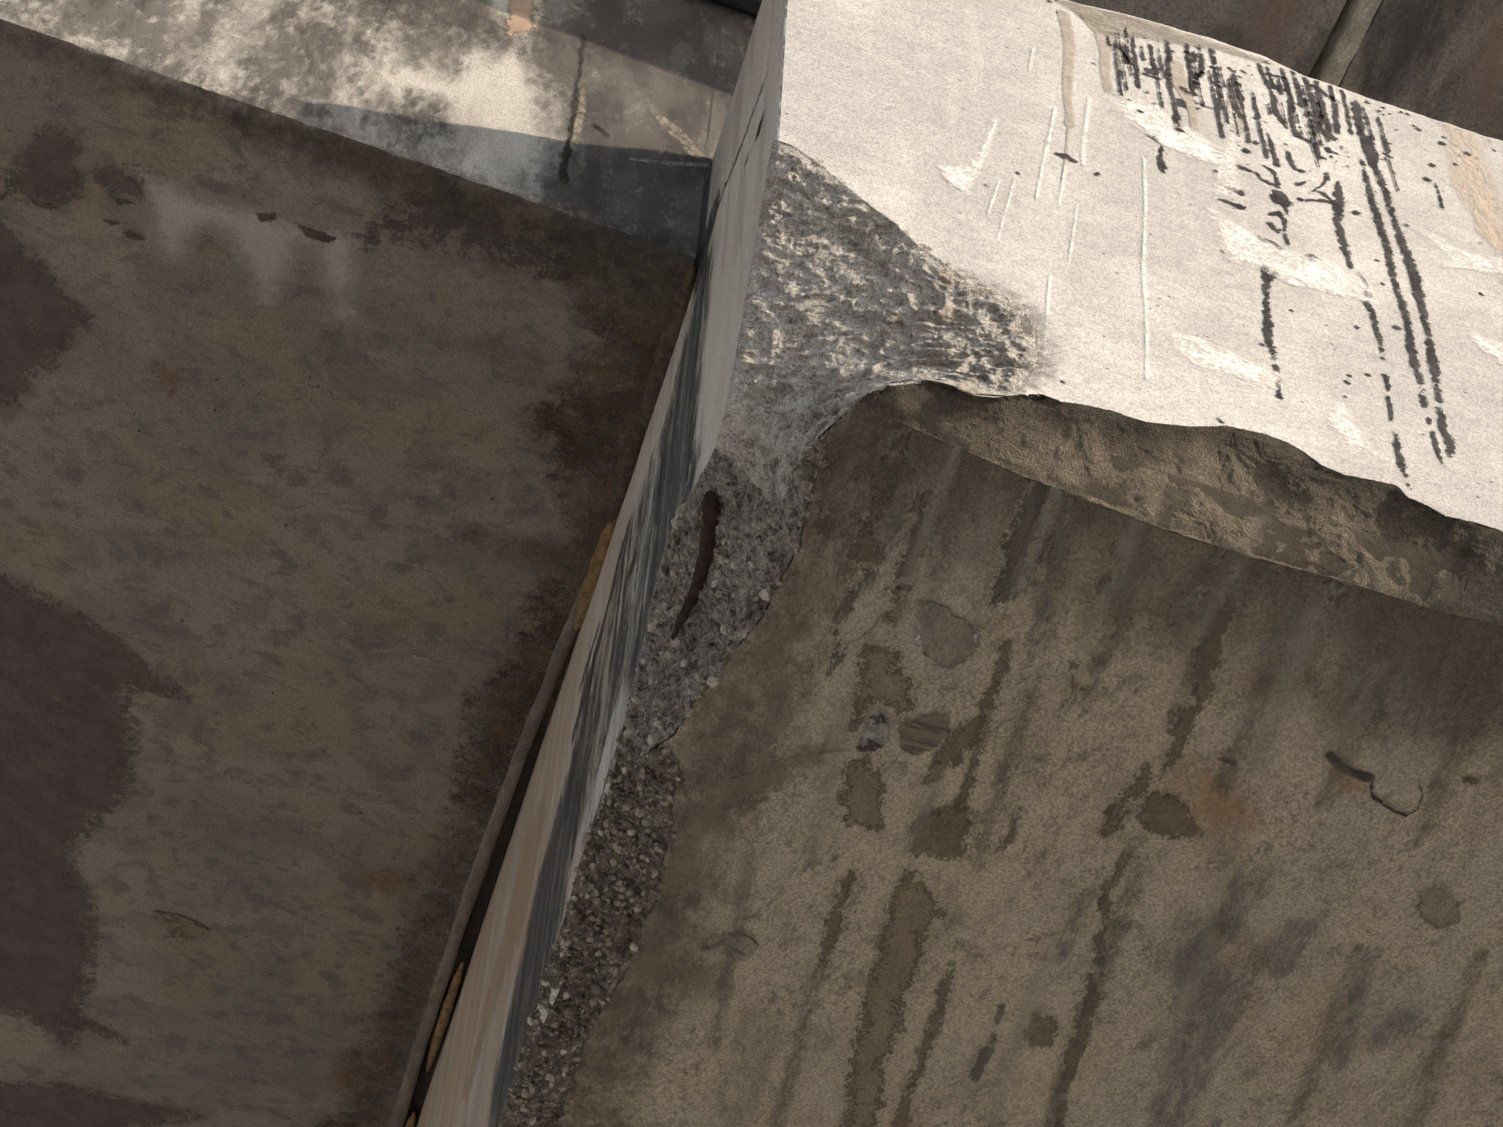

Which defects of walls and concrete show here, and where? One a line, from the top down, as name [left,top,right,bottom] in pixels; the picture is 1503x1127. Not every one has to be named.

crack [559,35,610,184]
crack [716,73,767,209]
leakage [939,120,1020,238]
leakage [1036,0,1456,490]
leakage [1423,136,1496,209]
leakage [0,0,757,1127]
leakage [812,429,940,738]
leakage [836,638,1014,1127]
spalling [499,139,1503,1127]
leakage [988,481,1058,608]
leakage [1020,587,1237,1127]
crack [1325,751,1423,817]